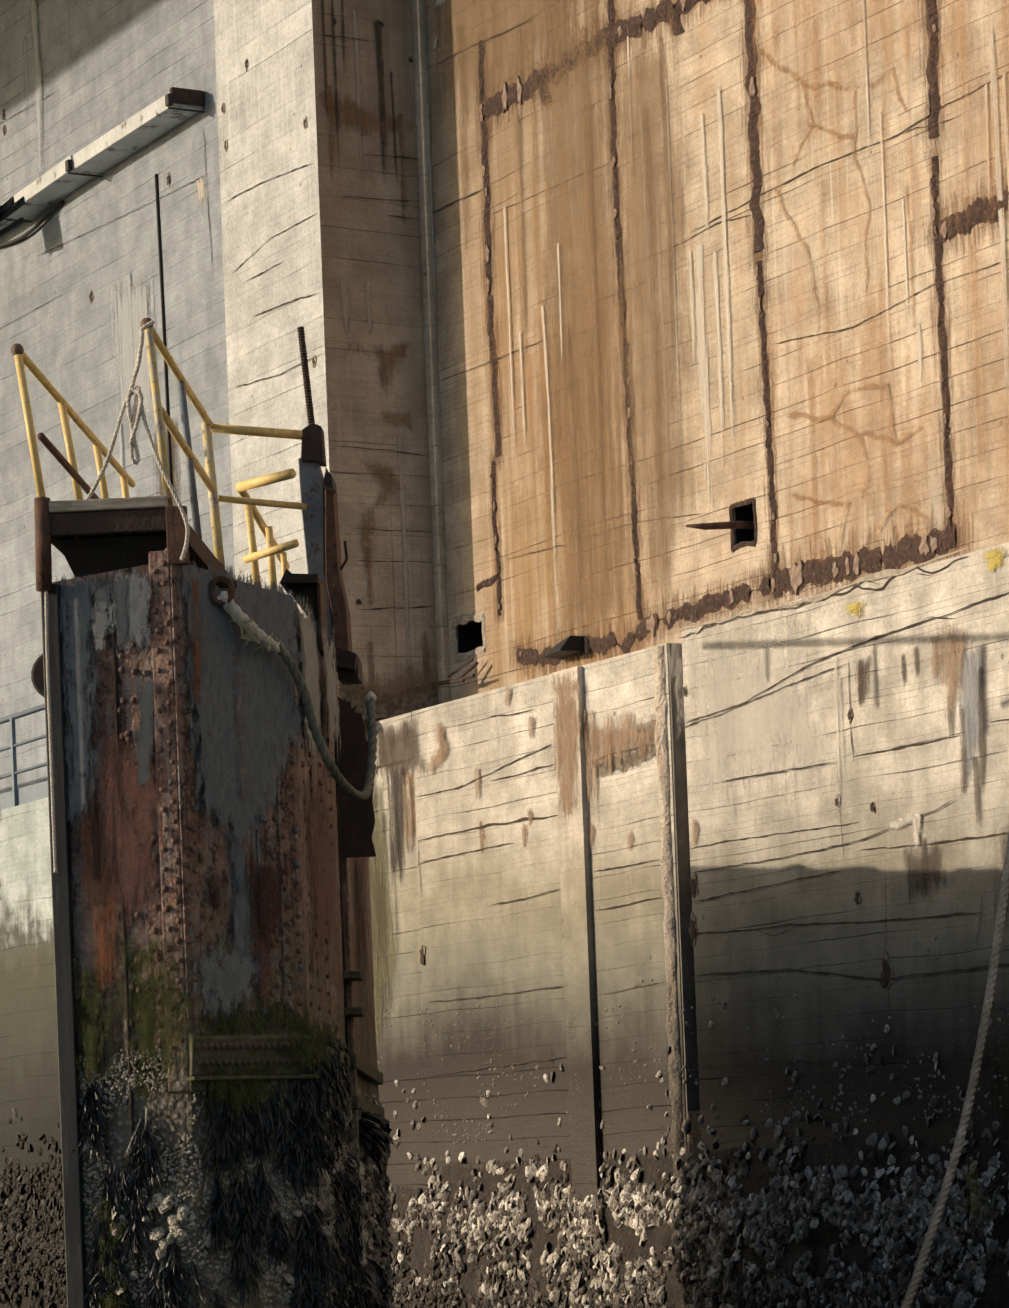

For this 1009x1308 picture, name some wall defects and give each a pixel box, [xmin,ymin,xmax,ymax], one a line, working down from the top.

crack [623,72,1009,268]
peeling [57,568,152,825]
peeling [133,673,157,786]
peeling [177,561,502,1021]
leakage [375,720,423,944]
leakage [889,813,946,899]
leakage [958,645,983,770]